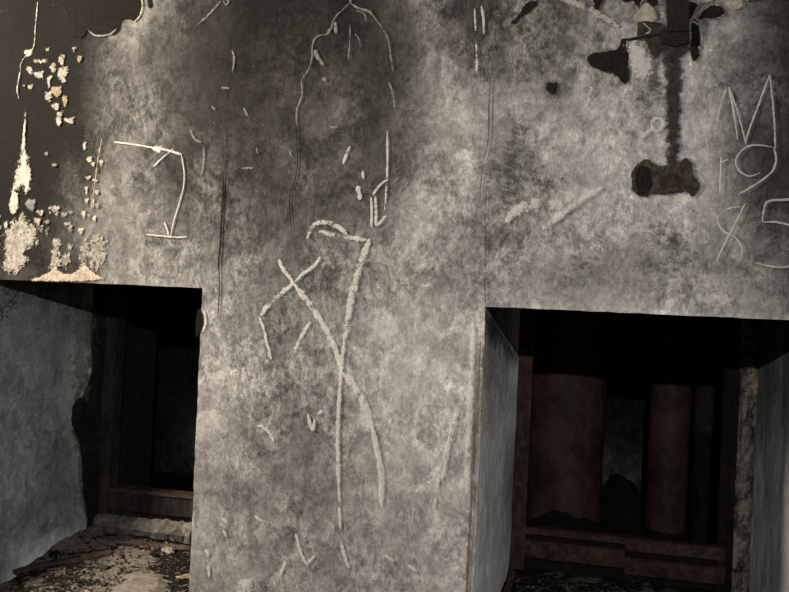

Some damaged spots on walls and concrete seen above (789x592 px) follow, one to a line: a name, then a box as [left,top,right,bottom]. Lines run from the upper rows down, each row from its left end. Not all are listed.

spalling [23,0,152,126]
spalling [586,0,666,85]
spalling [677,0,758,62]
spalling [0,206,108,282]
peeling [73,139,103,221]
crack [218,133,226,313]
crack [479,76,491,305]
flaking render [71,306,92,514]